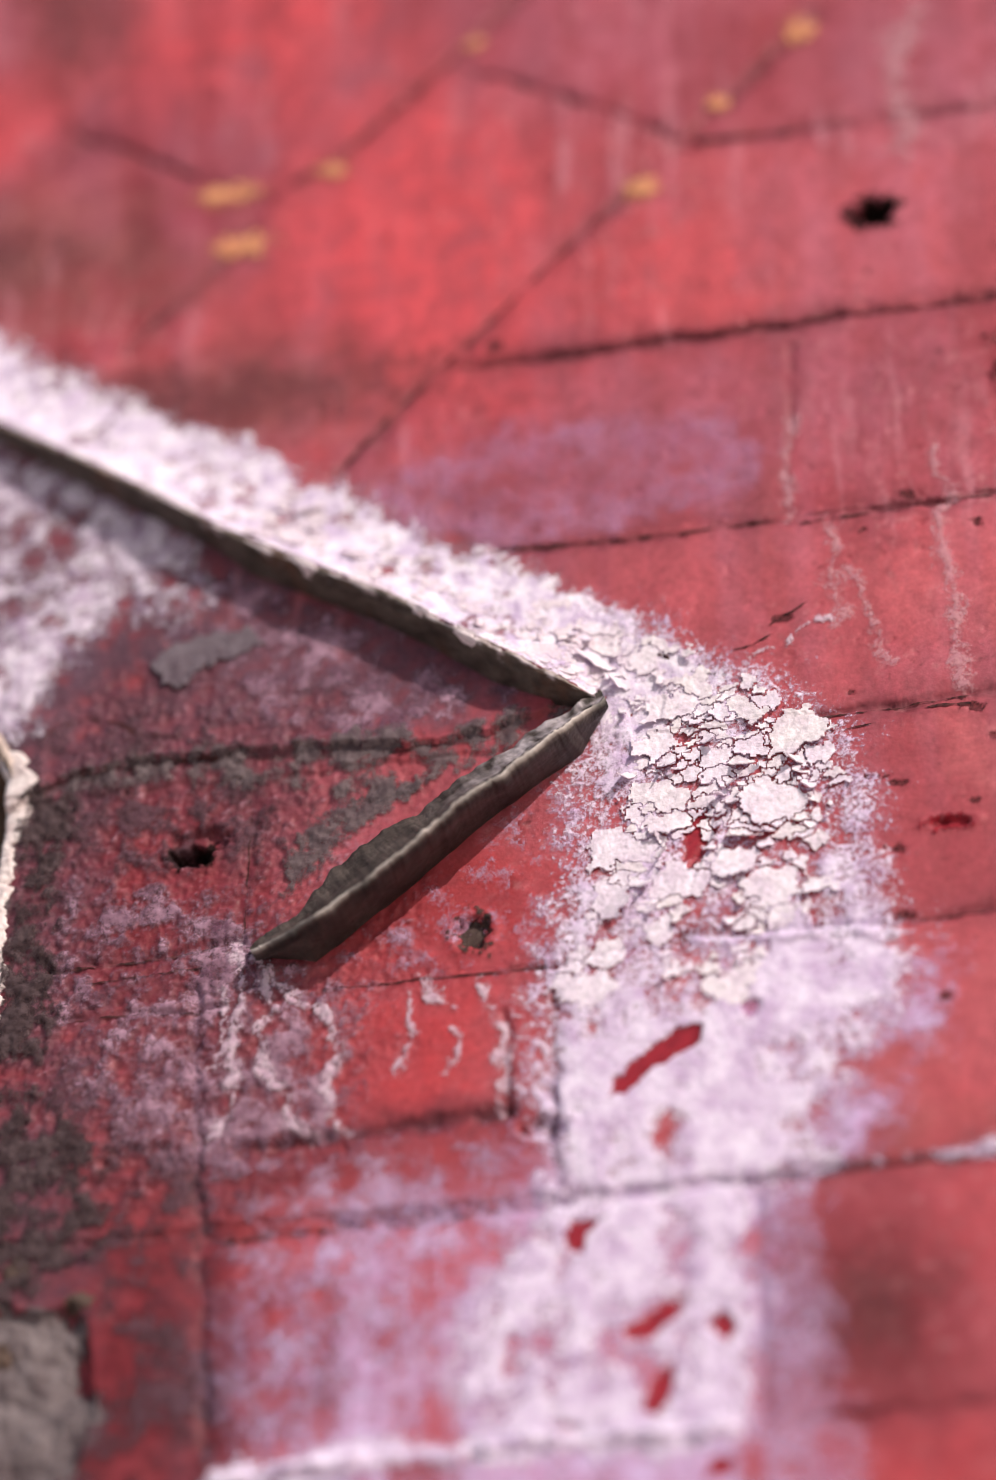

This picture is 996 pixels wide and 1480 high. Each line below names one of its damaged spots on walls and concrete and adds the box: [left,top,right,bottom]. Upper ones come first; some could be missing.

peeling [150,624,265,689]
peeling [960,701,987,711]
peeling [242,495,909,1018]
flaking render [0,735,39,1016]
damp [0,333,953,1480]
peeling [898,910,917,920]
peeling [608,1023,703,1097]
peeling [563,1219,599,1254]
peeling [626,1296,686,1339]
peeling [708,1310,738,1341]
spalling [0,1256,106,1480]
peeling [639,1365,674,1415]